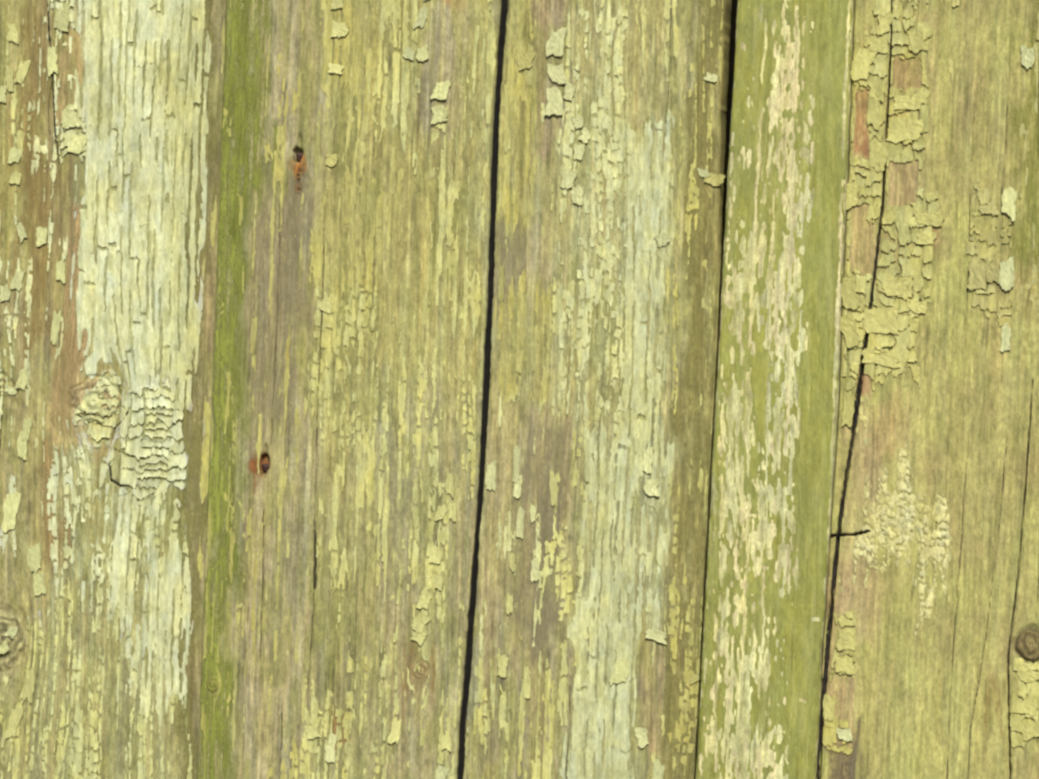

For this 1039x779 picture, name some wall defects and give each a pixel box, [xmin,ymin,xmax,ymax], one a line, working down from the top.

crack [884,5,892,142]
peeling [1020,12,1039,113]
peeling [223,179,257,225]
peeling [966,167,1039,352]
peeling [0,0,245,779]
corrosion [249,453,270,474]
peeling [309,0,814,779]
crack [817,171,885,779]
peeling [852,448,953,640]
peeling [292,625,402,779]
peeling [823,610,857,755]
peeling [1010,658,1039,749]